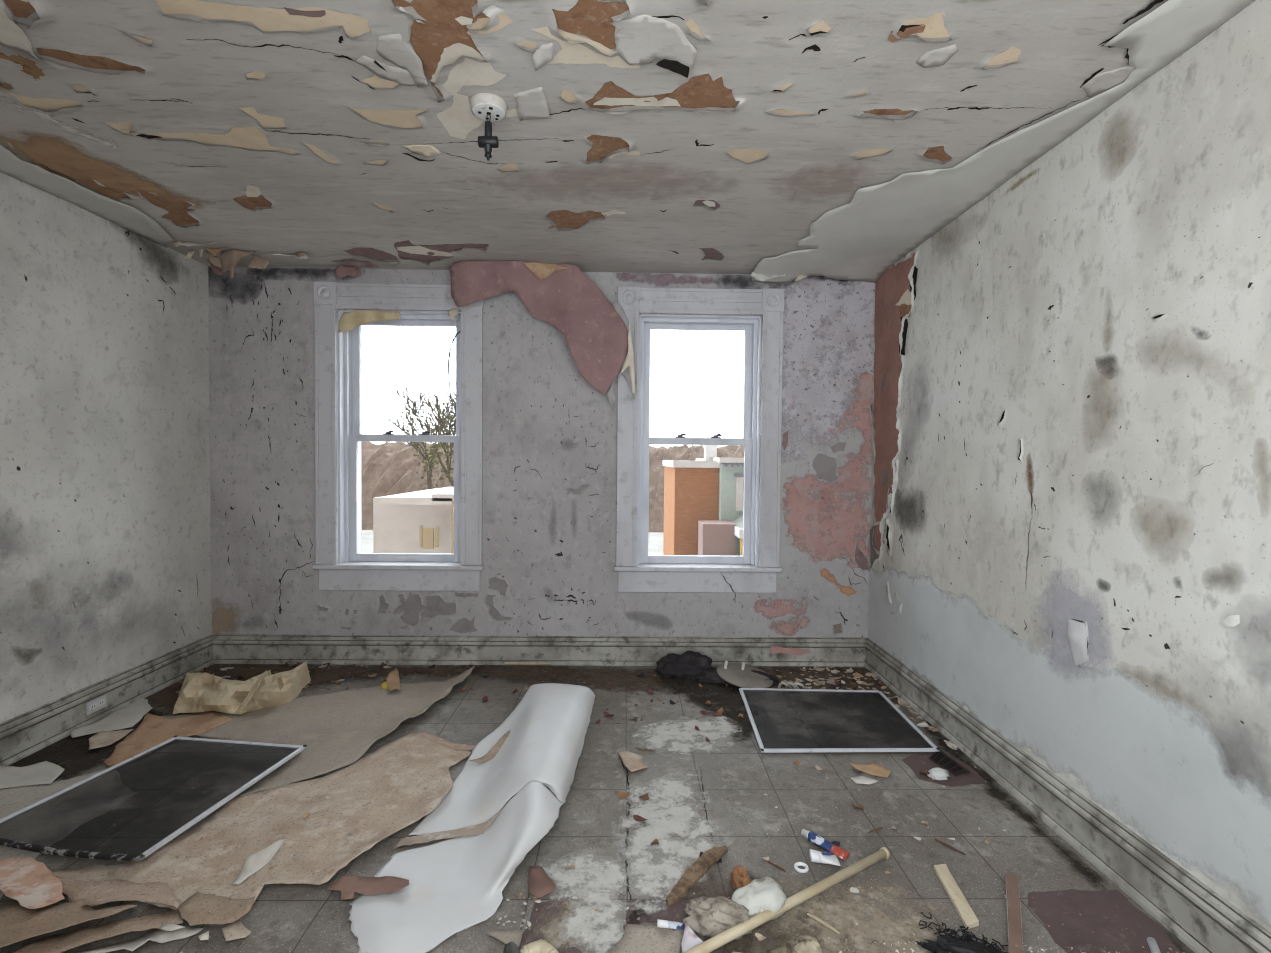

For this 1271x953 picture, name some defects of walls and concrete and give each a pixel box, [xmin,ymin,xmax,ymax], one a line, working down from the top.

peeling [1,0,161,77]
crack [187,36,375,90]
peeling [148,0,823,139]
peeling [887,6,960,44]
crack [265,130,366,139]
peeling [577,129,640,166]
peeling [75,178,207,228]
peeling [540,207,625,231]
mould [129,231,175,270]
peeling [338,238,494,266]
peeling [853,246,929,615]
leakage [1046,586,1105,668]